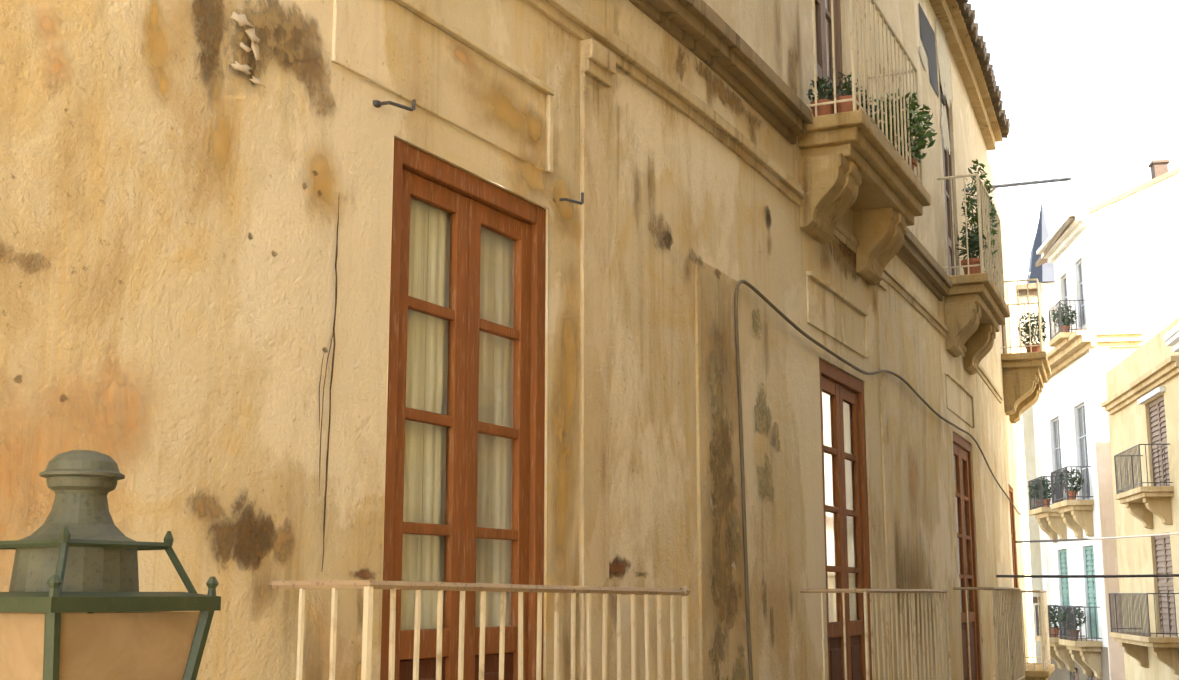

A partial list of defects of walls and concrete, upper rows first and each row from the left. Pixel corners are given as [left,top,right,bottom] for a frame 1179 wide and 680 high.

flaking render [193,0,335,114]
flaking render [303,154,334,205]
water stain [635,165,654,213]
water stain [650,218,673,250]
crack [319,200,339,570]
water stain [193,494,293,606]